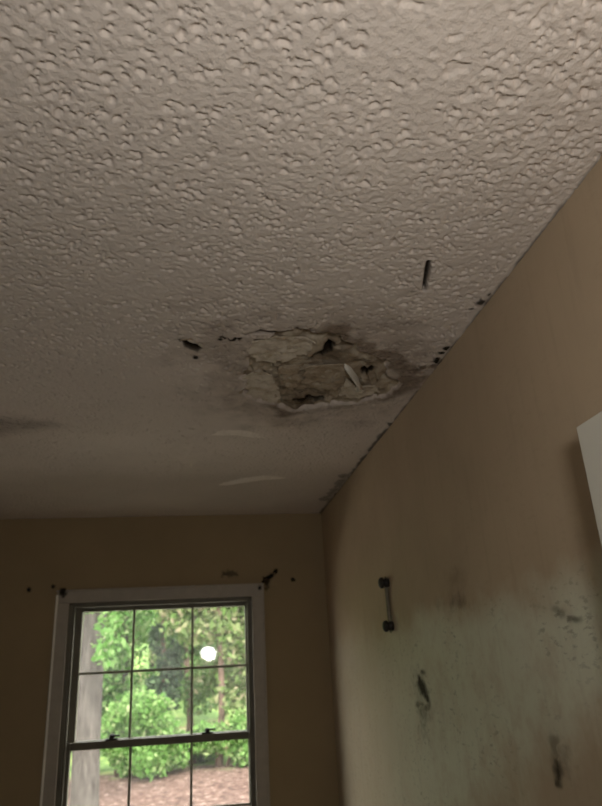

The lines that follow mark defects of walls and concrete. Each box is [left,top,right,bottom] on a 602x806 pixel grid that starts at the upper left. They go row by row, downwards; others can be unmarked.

peeling [179,338,201,359]